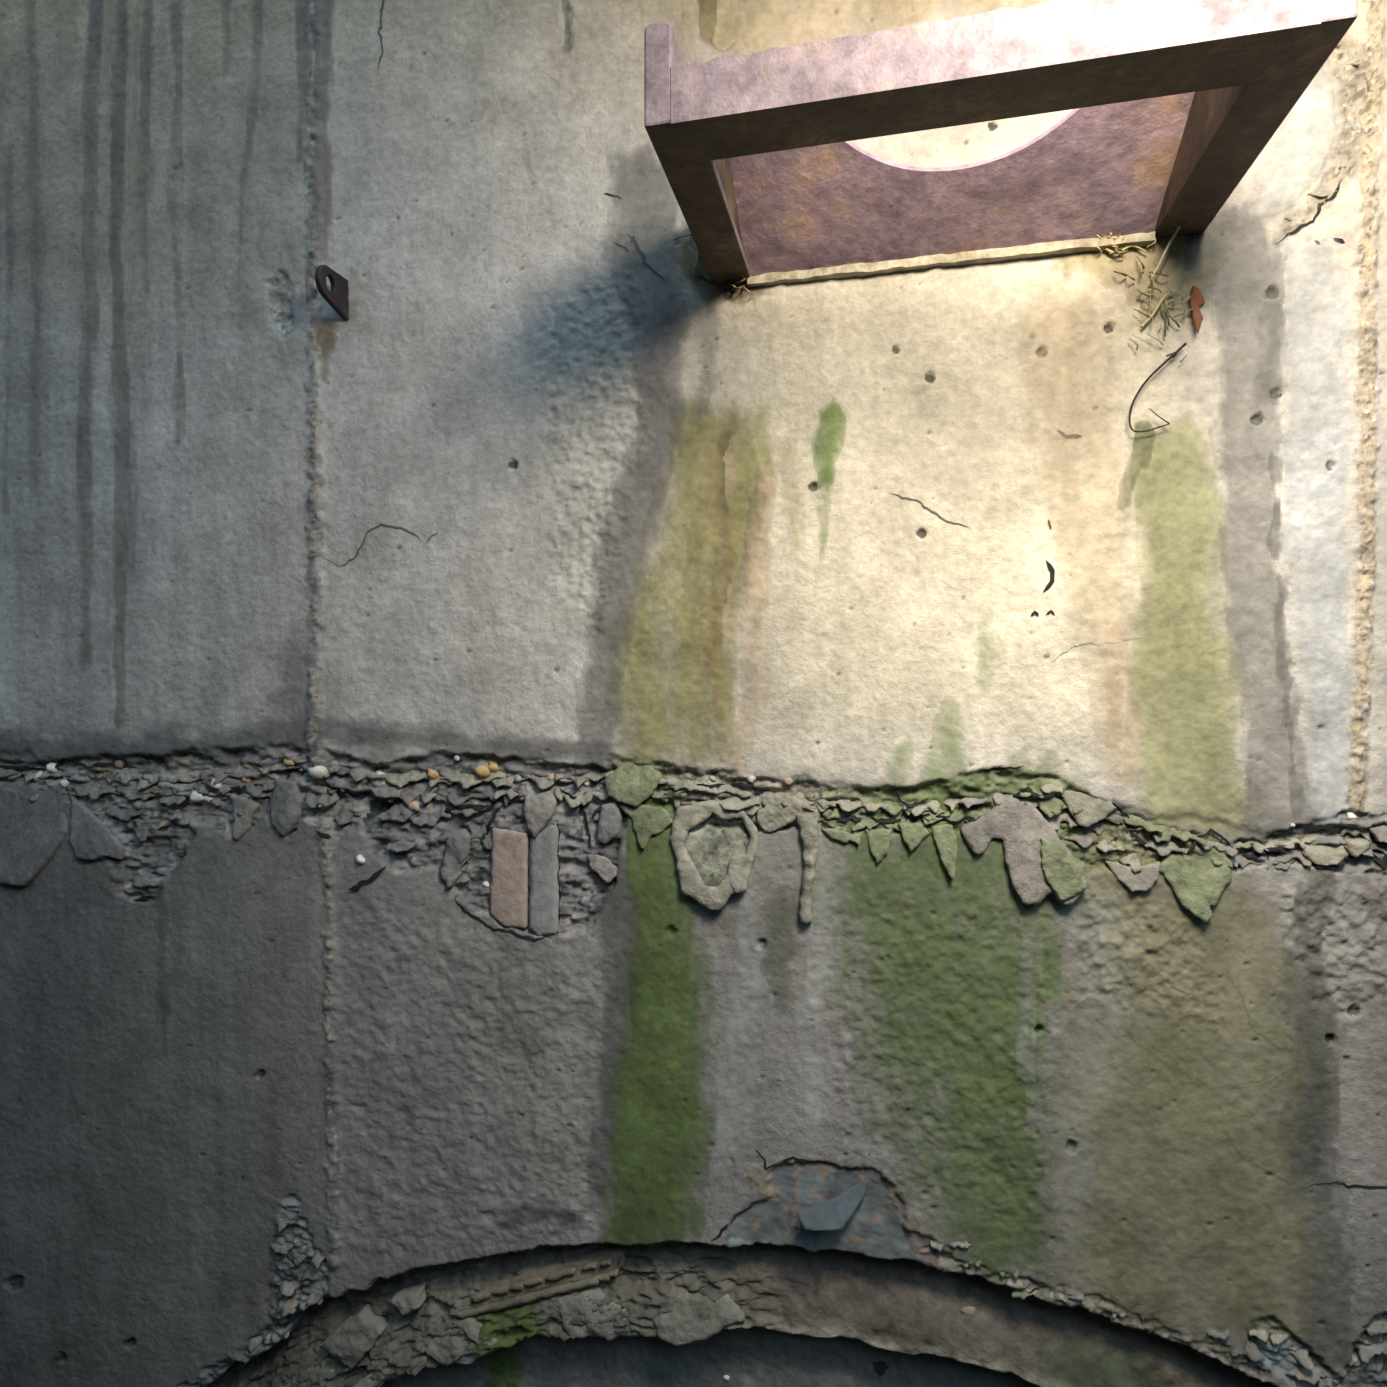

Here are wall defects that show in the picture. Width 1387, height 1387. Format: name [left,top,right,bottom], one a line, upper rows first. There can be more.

crack [377,0,385,74]
water stain [298,0,331,252]
water stain [111,122,122,284]
crack [1276,179,1342,244]
crack [323,523,438,567]
crack [890,493,970,528]
water stain [224,745,241,755]
spalling [0,743,1387,939]
water stain [937,852,958,886]
crack [1226,1131,1387,1189]
spalling [183,1194,331,1387]
spalling [726,1162,1387,1387]